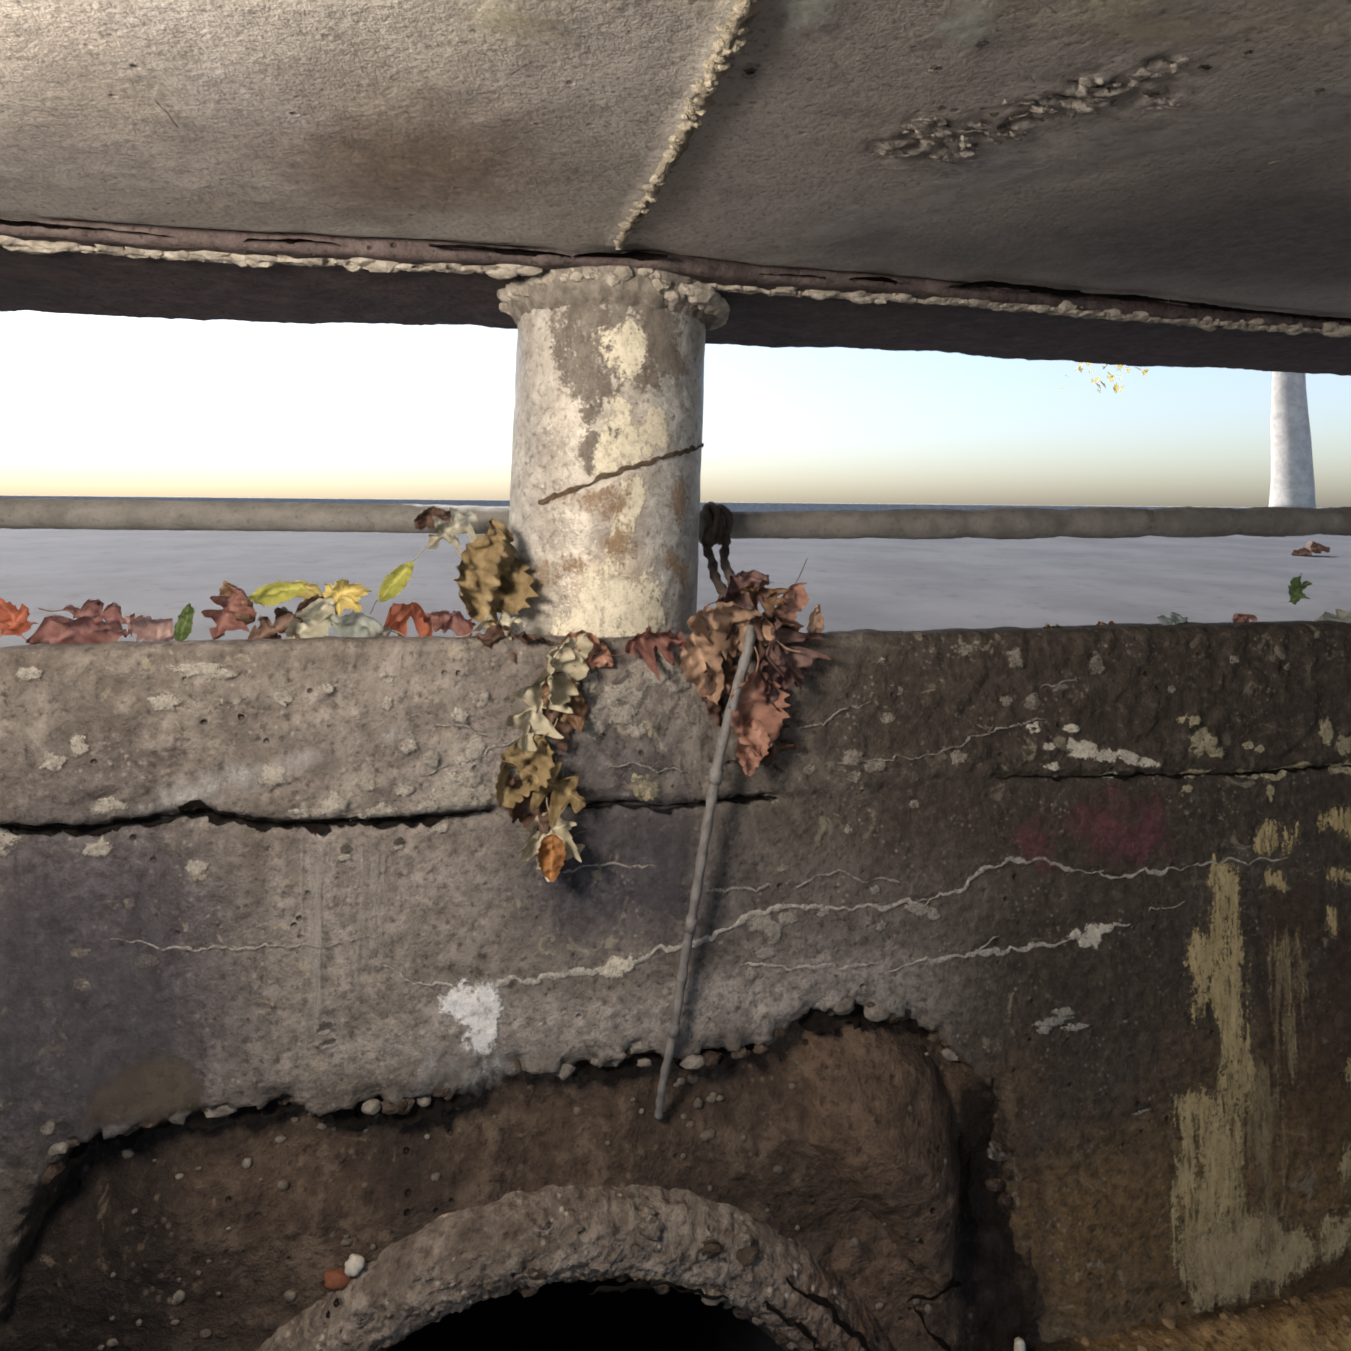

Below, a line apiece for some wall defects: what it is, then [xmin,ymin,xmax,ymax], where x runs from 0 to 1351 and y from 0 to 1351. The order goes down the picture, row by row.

crack [429,0,760,261]
spalling [878,57,1212,165]
crack [0,219,175,238]
crack [949,281,1351,323]
crack [538,441,704,505]
crack [567,760,776,815]
crack [108,856,1288,992]
spalling [119,1104,237,1159]
spalling [361,1086,461,1133]
spalling [556,1041,651,1081]
spalling [671,1027,785,1142]
damp [951,1085,1038,1351]